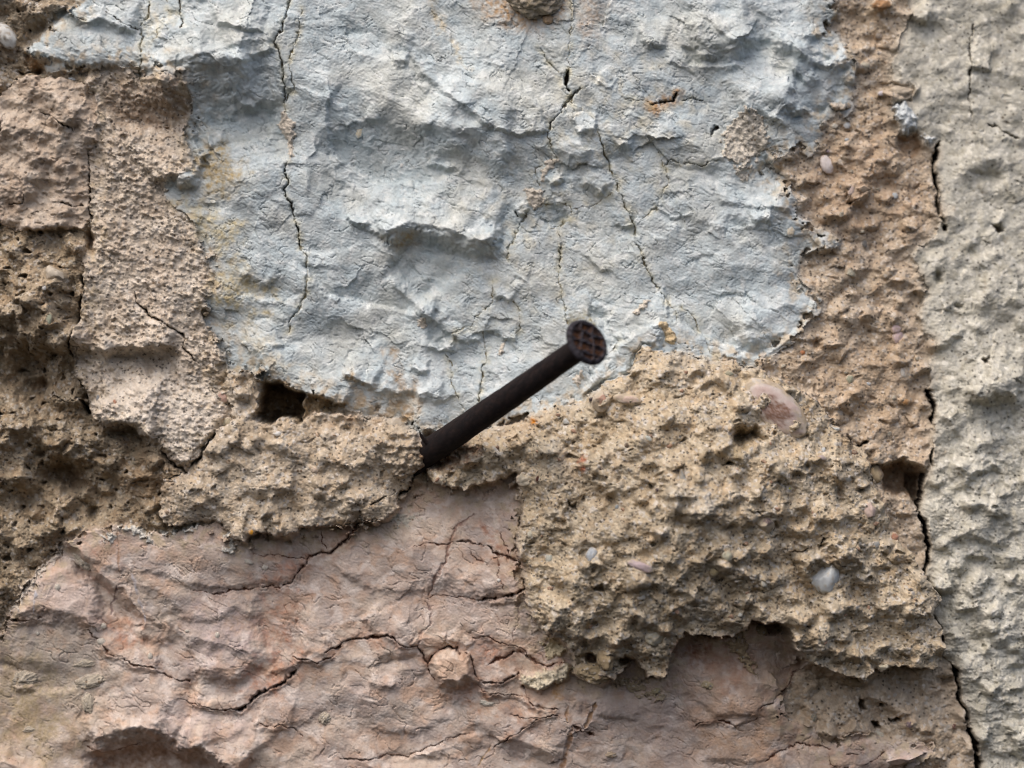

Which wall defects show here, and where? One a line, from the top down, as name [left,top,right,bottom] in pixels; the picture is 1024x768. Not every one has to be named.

crack [274,0,303,110]
crack [283,161,309,334]
crack [445,3,722,410]
crack [931,141,948,231]
corrosion [411,428,486,477]
crack [191,475,417,595]
crack [417,532,527,602]
crack [914,389,981,768]
crack [88,630,595,747]
crack [340,733,471,761]